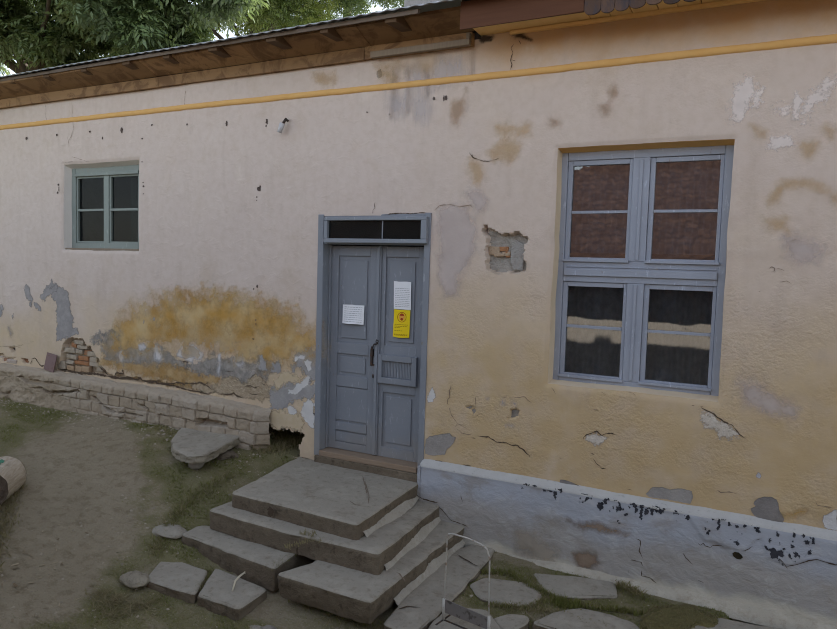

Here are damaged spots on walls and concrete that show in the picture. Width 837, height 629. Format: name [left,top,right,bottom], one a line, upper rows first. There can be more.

peeling [730,76,765,122]
flaking render [488,229,528,272]
peeling [24,279,108,373]
damp [91,289,316,390]
peeling [192,347,316,433]
flaking render [700,411,739,439]
peeling [579,493,690,524]
peeling [705,519,761,546]
peeling [764,531,815,566]